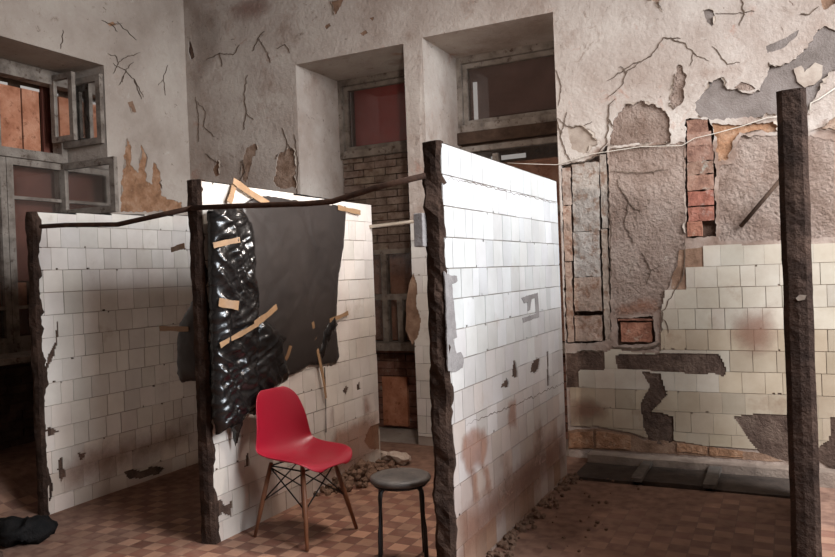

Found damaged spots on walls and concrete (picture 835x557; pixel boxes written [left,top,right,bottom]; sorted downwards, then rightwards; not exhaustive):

crack [102,20,168,99]
crack [206,31,289,62]
peeling [325,0,343,29]
crack [556,37,740,164]
peeling [273,147,298,189]
spalling [120,139,231,544]
crack [608,169,668,292]
spalling [562,26,835,557]